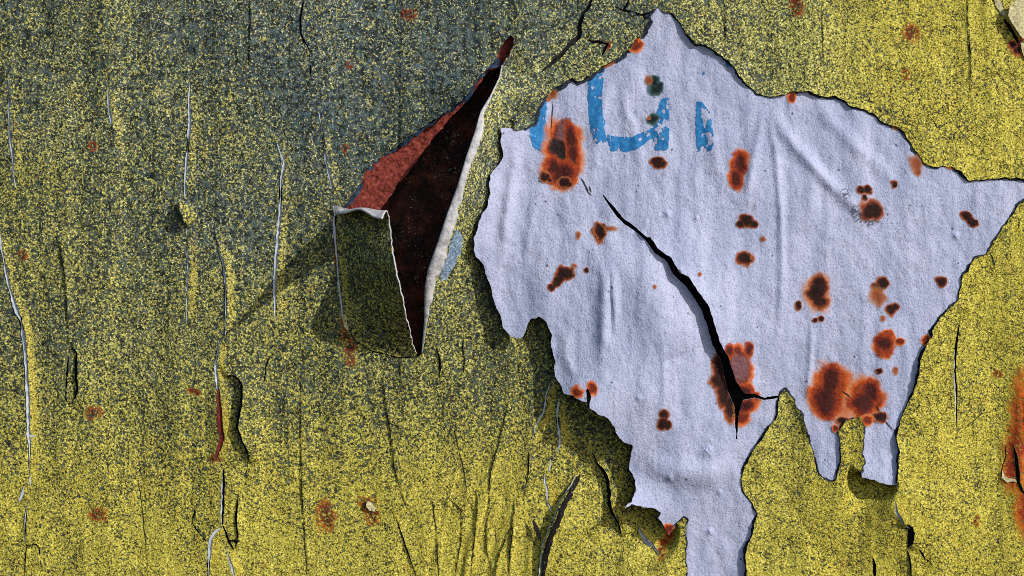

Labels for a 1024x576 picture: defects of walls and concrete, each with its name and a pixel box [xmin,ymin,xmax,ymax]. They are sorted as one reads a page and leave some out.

corrosion [540,119,584,191]
corrosion [576,221,617,244]
corrosion [727,149,750,191]
corrosion [851,184,884,226]
corrosion [547,263,589,292]
crack [581,178,779,439]
peeling [474,0,1024,576]
corrosion [795,272,830,323]
corrosion [708,341,762,427]
corrosion [806,276,905,433]
crack [378,360,660,576]
corrosion [1001,371,1024,534]